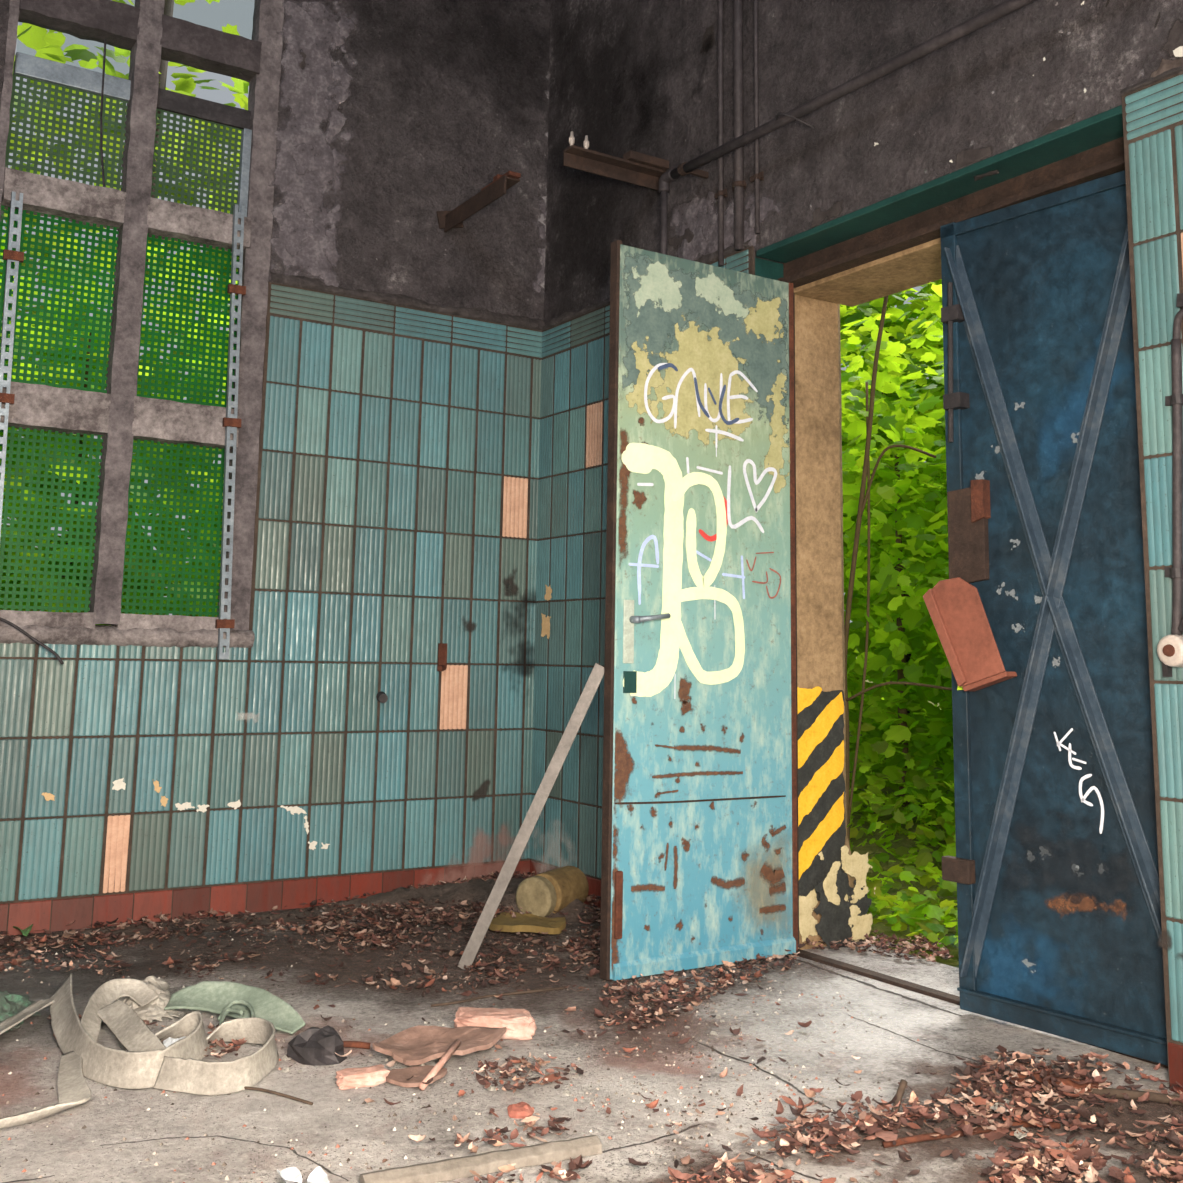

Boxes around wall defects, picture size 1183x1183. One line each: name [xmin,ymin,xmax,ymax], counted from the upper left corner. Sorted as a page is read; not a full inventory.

peeling [622,191,790,493]
spalling [153,780,209,813]
spalling [280,805,330,850]
rust [614,731,634,812]
rust [631,825,699,892]
rust [641,679,744,829]
rust [711,876,745,889]
rust [759,825,786,914]
peeling [799,846,876,949]
crack [3,1175,55,1183]
crack [100,1136,348,1181]
crack [602,1124,700,1153]